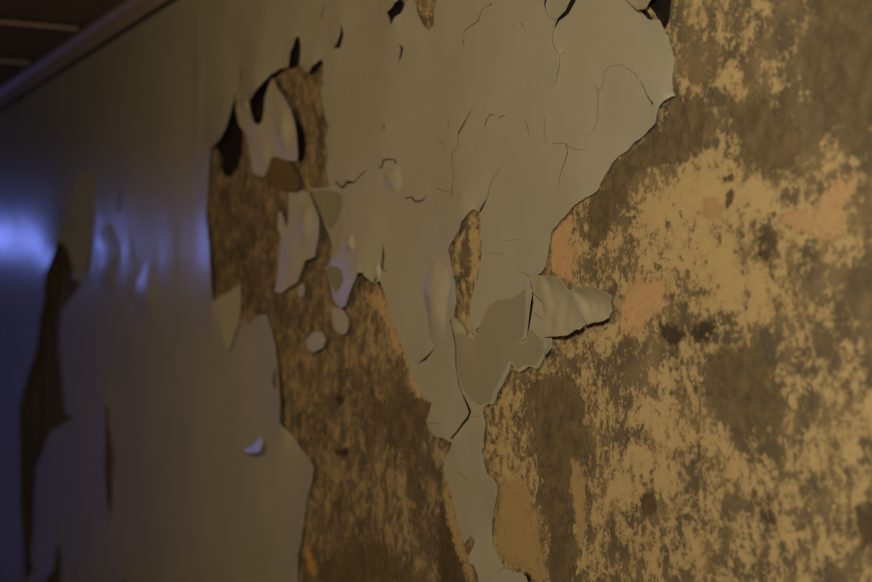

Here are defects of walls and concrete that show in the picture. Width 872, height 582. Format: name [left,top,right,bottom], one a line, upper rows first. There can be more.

peeling [387,0,437,30]
crack [544,0,576,86]
crack [335,158,397,188]
crack [406,113,504,202]
peeling [206,63,481,582]
peeling [481,0,872,582]
damp [659,319,784,453]
damp [532,369,592,582]
damp [641,492,657,517]
damp [760,497,780,527]